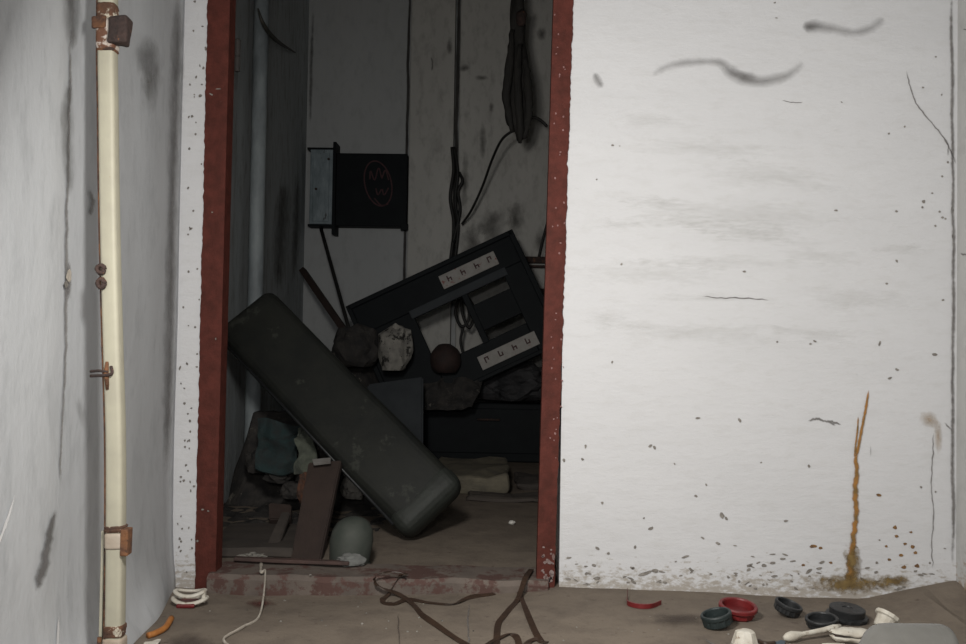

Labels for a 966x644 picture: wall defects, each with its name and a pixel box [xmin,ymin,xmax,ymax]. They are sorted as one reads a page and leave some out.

crack [907,3,966,561]
corrosion [820,392,919,593]
spalling [541,546,600,585]
flaking render [623,567,667,584]
flaking render [727,553,795,590]